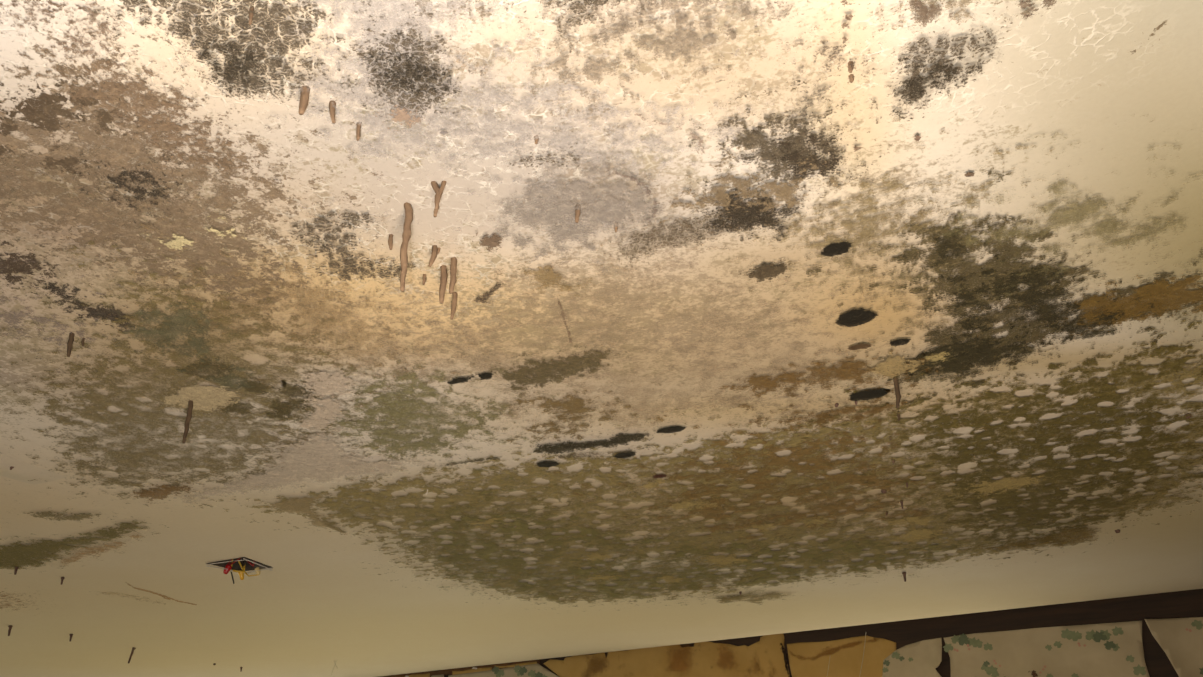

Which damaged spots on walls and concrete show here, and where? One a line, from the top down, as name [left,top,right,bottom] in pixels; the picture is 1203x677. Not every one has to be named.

leakage [738,259,795,291]
leakage [654,423,687,434]
leakage [0,510,169,572]